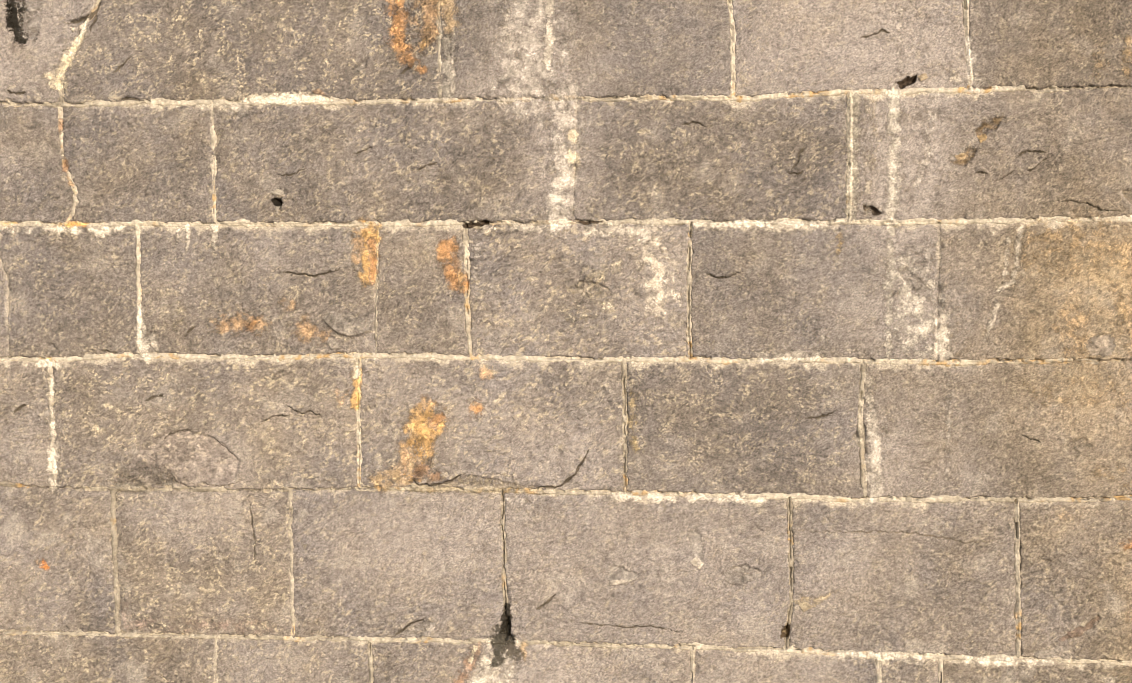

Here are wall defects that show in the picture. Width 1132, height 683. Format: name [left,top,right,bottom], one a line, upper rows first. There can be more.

corrosion [383,0,465,75]
corrosion [350,215,384,288]
corrosion [433,234,471,296]
spalling [109,431,240,489]
corrosion [365,394,485,497]